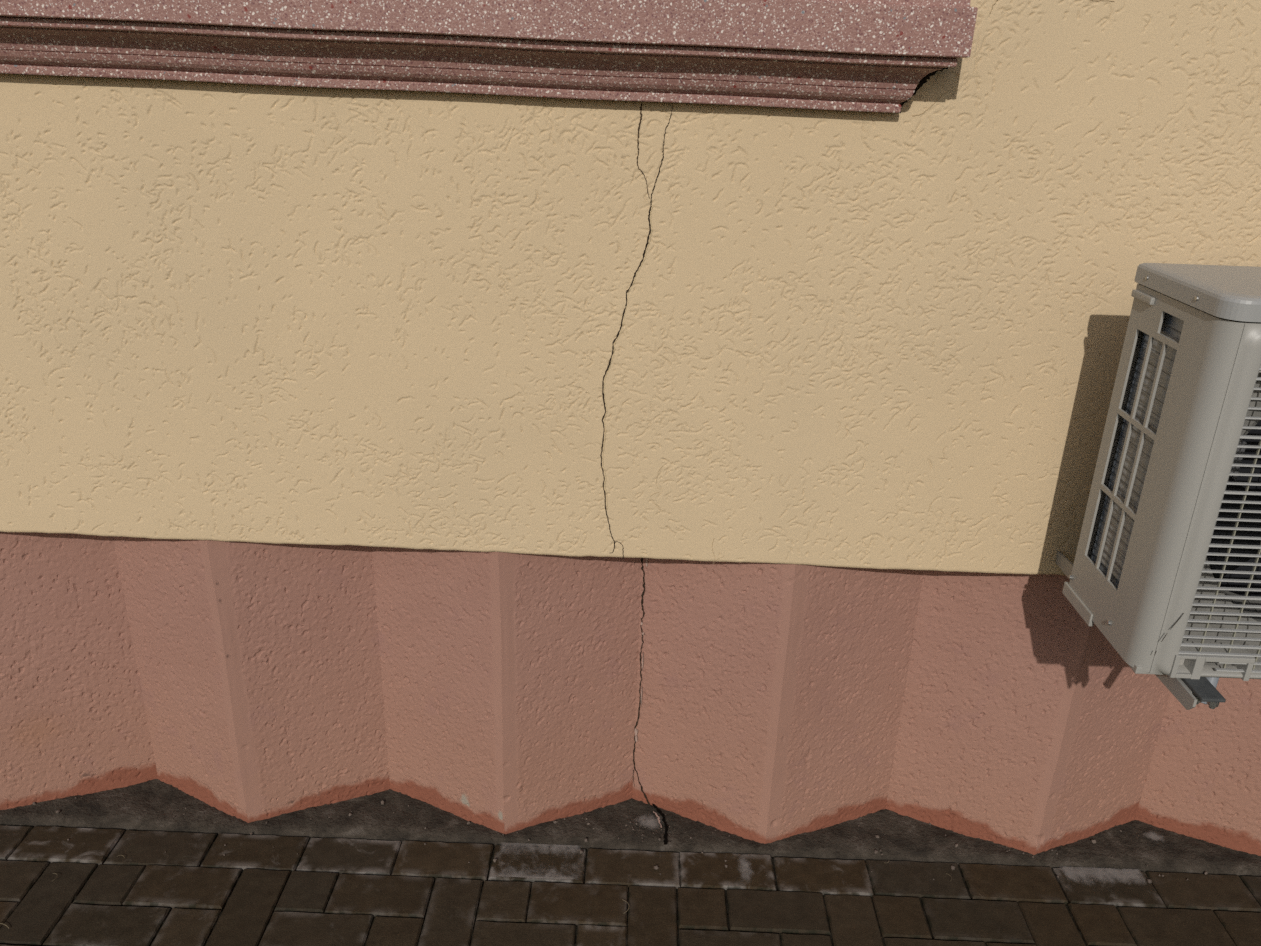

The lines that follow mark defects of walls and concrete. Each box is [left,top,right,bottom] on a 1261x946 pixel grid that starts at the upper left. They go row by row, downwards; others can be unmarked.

crack [600,104,673,806]